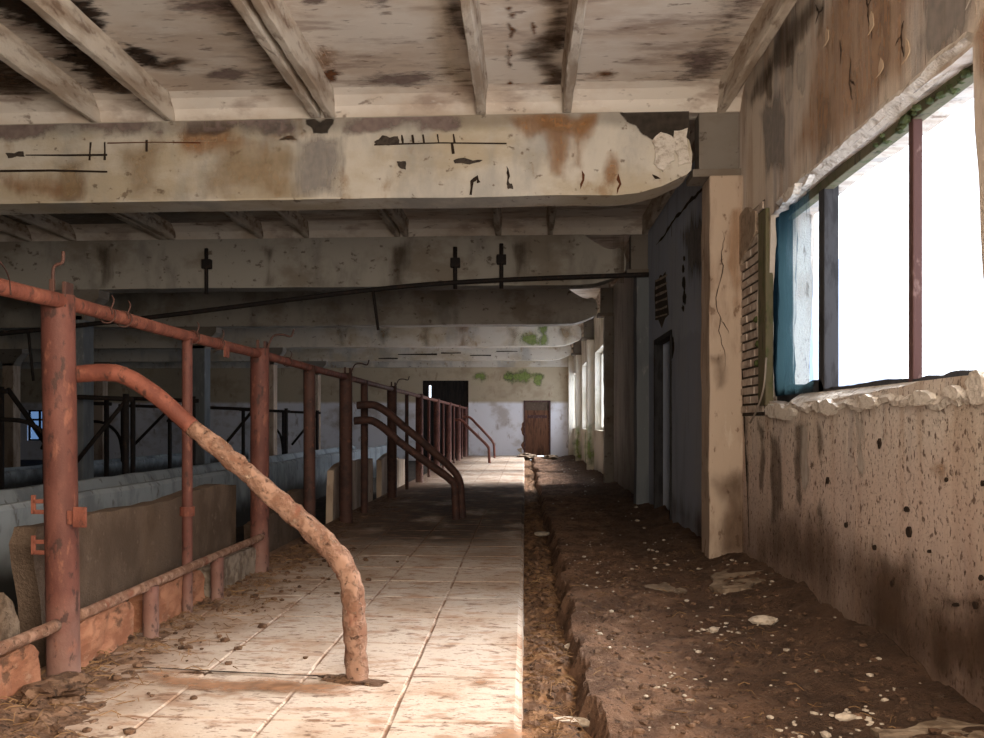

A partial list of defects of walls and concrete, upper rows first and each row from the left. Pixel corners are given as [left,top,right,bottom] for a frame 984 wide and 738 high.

water stain [0,0,130,94]
water stain [124,44,186,70]
water stain [178,2,292,90]
water stain [370,71,430,87]
water stain [522,0,567,85]
crack [895,21,904,57]
rust [517,114,595,170]
spalling [620,111,691,172]
crack [656,188,702,245]
peeling [655,272,669,328]
flaking render [739,199,765,416]